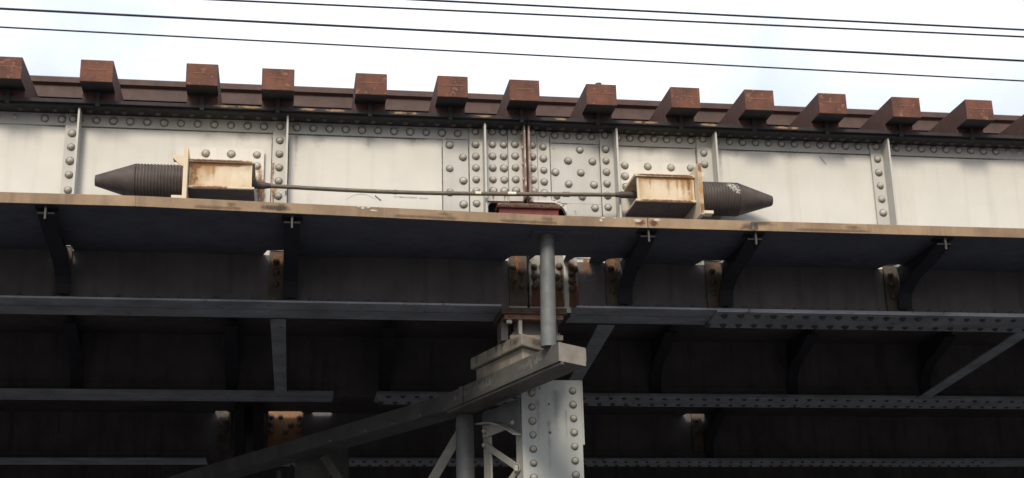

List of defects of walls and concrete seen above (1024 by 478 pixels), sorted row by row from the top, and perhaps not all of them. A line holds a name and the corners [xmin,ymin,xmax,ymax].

rust [506,256,540,318]
rust [555,258,591,319]